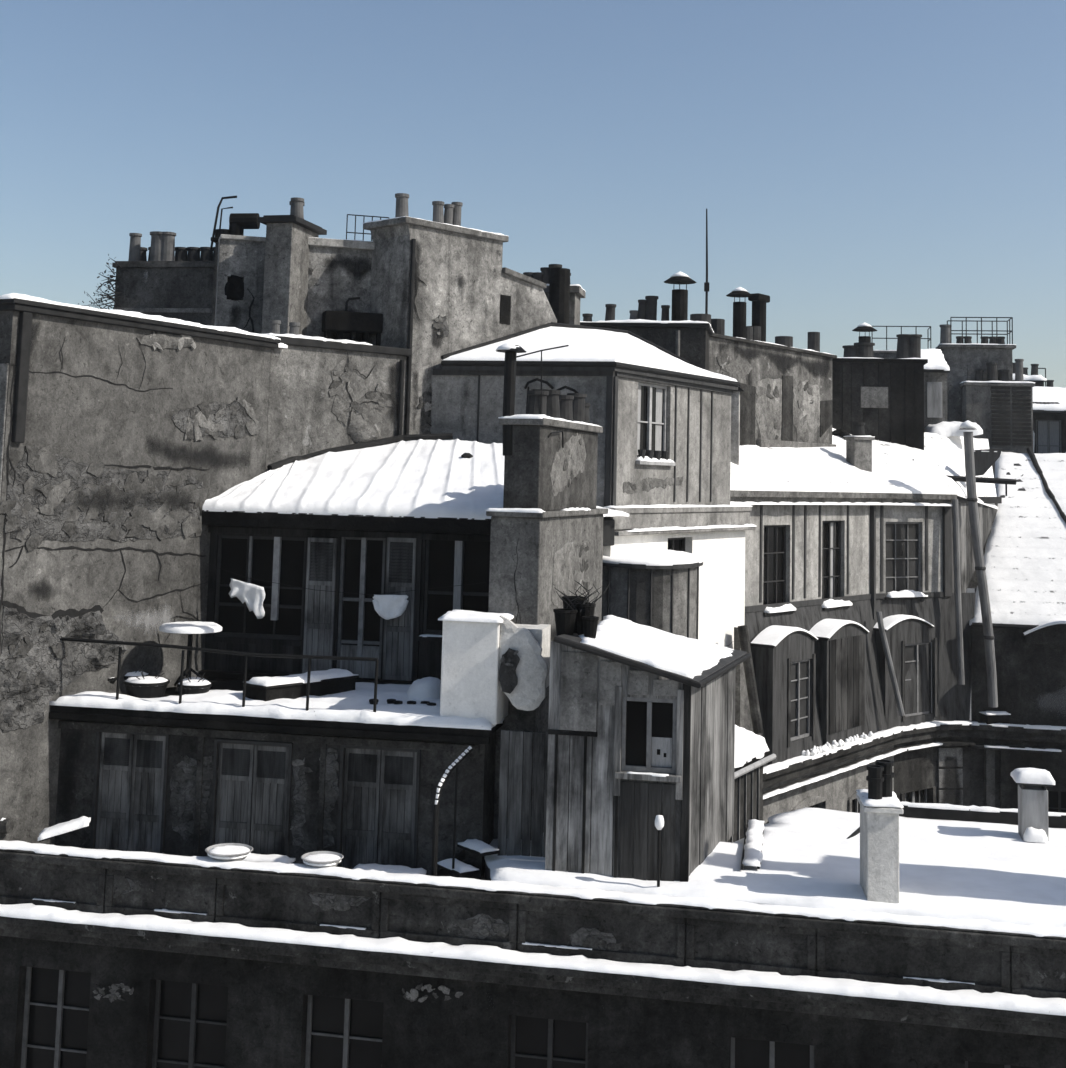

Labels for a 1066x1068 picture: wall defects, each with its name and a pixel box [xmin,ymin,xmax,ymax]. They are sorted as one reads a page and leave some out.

damp [327,258,372,280]
crack [243,289,255,333]
crack [5,339,173,489]
crack [346,350,379,443]
crack [106,464,208,472]
crack [0,515,207,669]
flaking render [93,981,142,1003]
flaking render [402,984,465,1002]